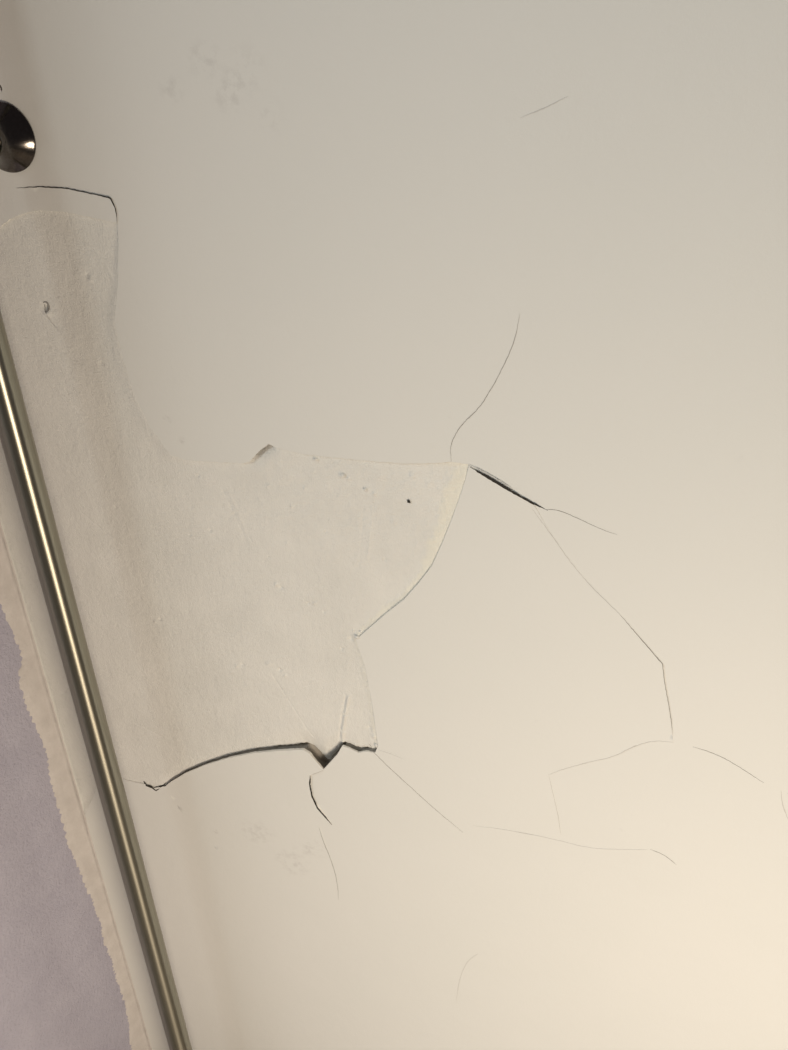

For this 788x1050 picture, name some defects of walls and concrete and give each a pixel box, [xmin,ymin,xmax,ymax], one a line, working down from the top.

crack [21,186,117,217]
flaking render [0,210,469,814]
crack [370,321,674,863]
crack [309,771,338,887]
crack [695,747,788,819]